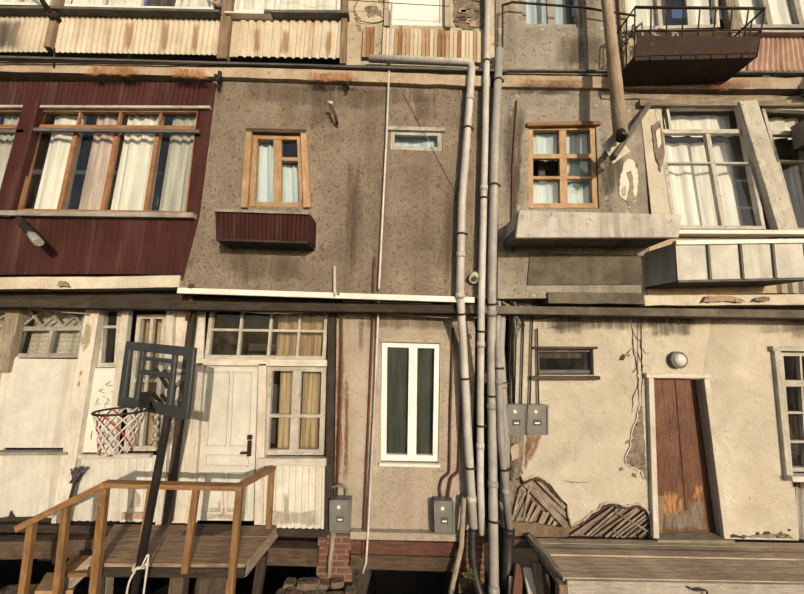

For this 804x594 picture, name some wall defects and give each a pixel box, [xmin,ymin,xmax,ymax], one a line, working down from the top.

spalling [354,0,384,24]
spalling [452,0,484,30]
peeling [619,159,638,202]
crack [620,319,645,413]
spalling [620,406,648,481]
spalling [512,474,651,539]